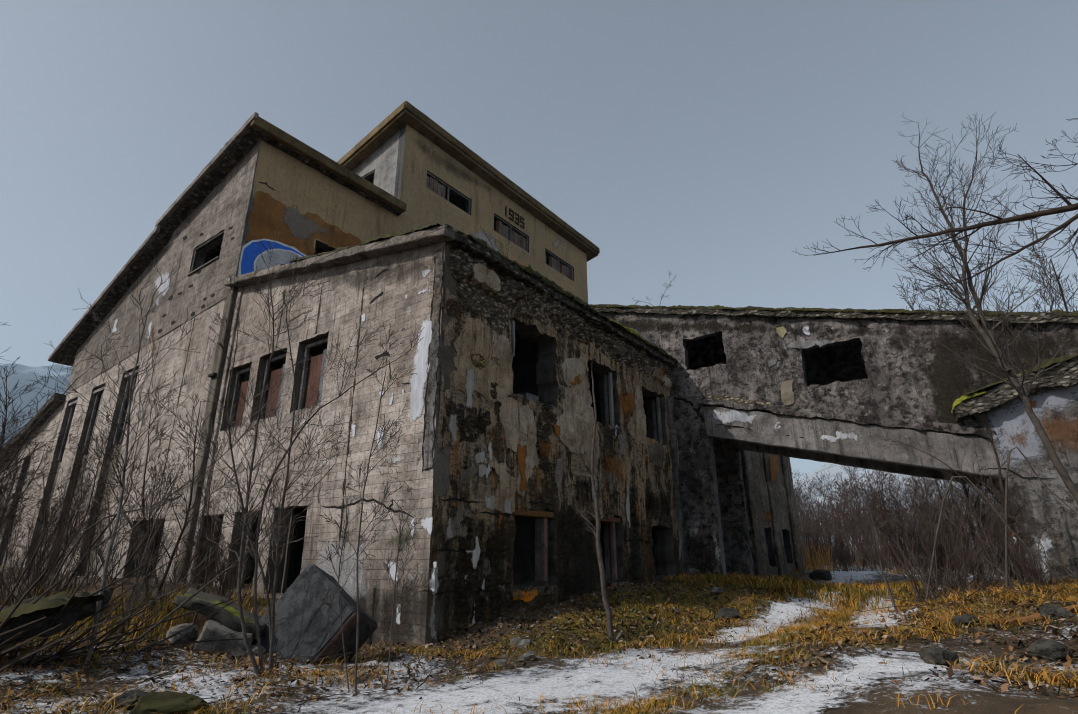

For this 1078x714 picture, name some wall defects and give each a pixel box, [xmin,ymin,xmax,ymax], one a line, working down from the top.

peeling [228,191,361,256]
peeling [471,263,501,293]
peeling [429,298,647,514]
peeling [983,384,1078,468]
peeling [443,501,473,540]